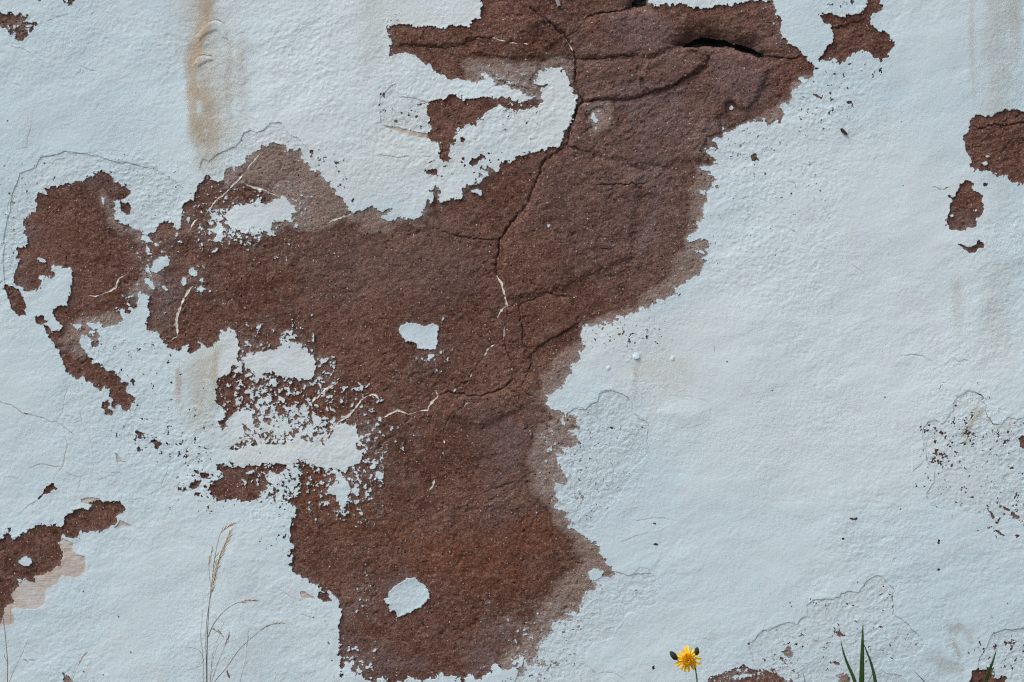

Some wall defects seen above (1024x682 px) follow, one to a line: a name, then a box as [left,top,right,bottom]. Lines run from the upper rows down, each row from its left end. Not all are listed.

peeling [818,0,895,73]
peeling [945,109,1024,231]
crack [315,10,697,454]
peeling [958,240,984,253]
peeling [0,0,819,682]